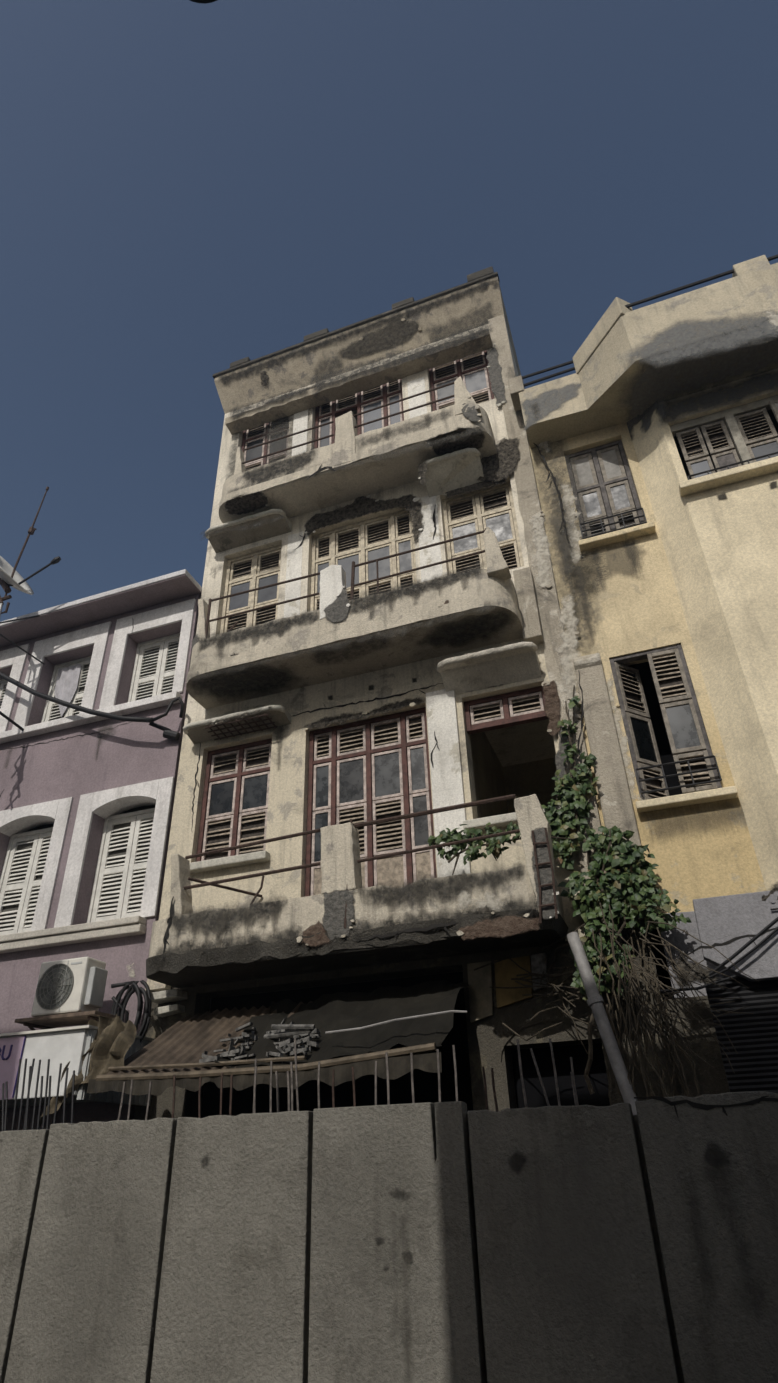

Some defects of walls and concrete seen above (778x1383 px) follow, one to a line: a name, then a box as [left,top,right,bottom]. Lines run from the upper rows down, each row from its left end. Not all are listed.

spalling [340,318,422,359]
spalling [304,345,520,543]
spalling [225,491,269,515]
water stain [535,440,594,646]
flaking render [324,586,351,623]
spalling [205,706,278,740]
flaking render [322,890,355,940]
water stain [351,863,538,935]